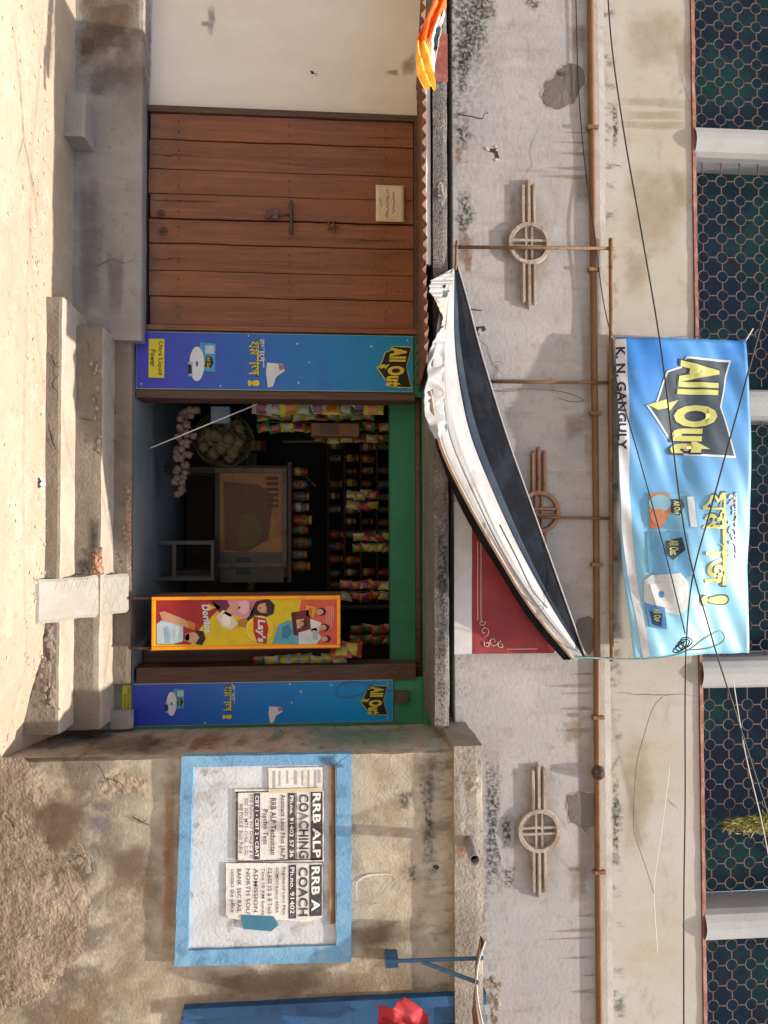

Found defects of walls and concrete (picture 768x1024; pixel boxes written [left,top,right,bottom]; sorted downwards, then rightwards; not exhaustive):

leakage [459,0,494,89]
leakage [457,196,472,235]
leakage [487,775,513,883]